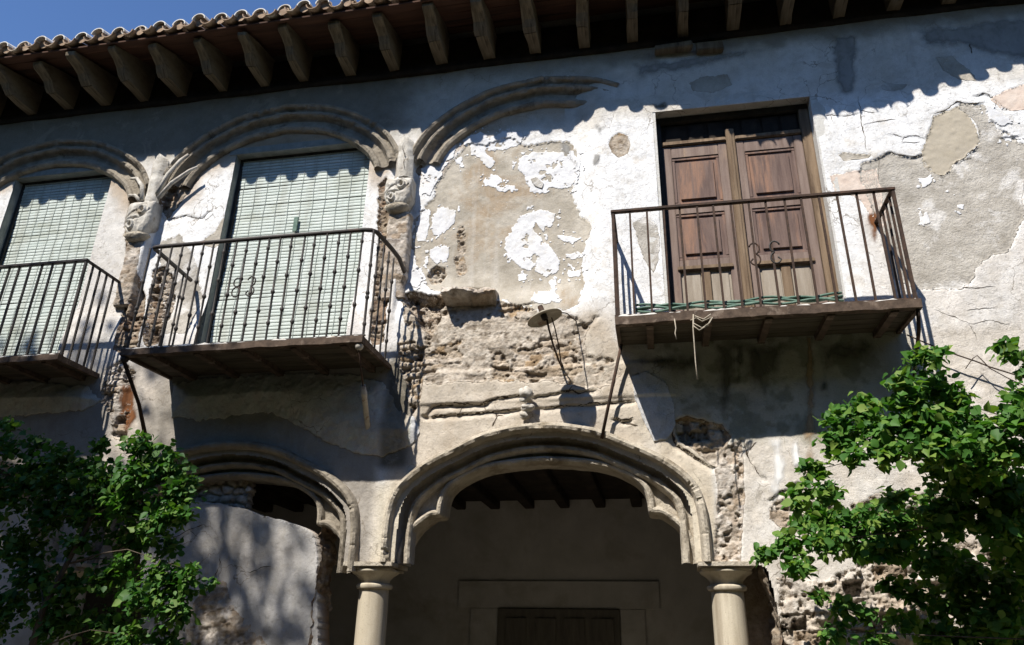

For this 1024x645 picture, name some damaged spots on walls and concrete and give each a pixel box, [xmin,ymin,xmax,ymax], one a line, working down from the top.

flaking render [689,74,732,93]
flaking render [609,133,630,158]
crack [826,102,923,176]
flaking render [830,85,1024,291]
flaking render [369,128,622,414]
flaking render [100,234,202,440]
rust [120,385,136,431]
leakage [721,346,780,401]
spalling [769,487,818,536]
spalling [850,492,889,516]
flaking render [776,558,964,645]
flaking render [956,536,1015,608]